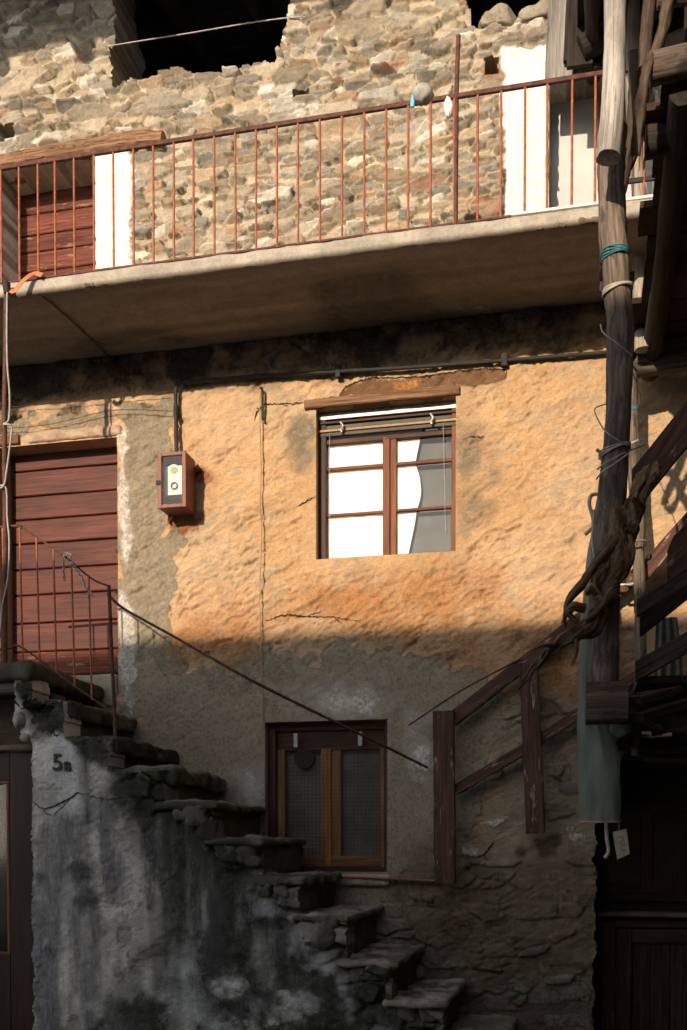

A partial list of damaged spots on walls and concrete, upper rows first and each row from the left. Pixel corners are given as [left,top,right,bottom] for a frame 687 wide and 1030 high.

crack [42,296,111,357]
flaking render [340,368,506,396]
corrosion [170,516,202,535]
damp [18,681,64,739]
flaking render [0,397,488,968]
crack [33,792,131,816]
flaking render [455,692,514,856]
damp [31,739,312,1030]